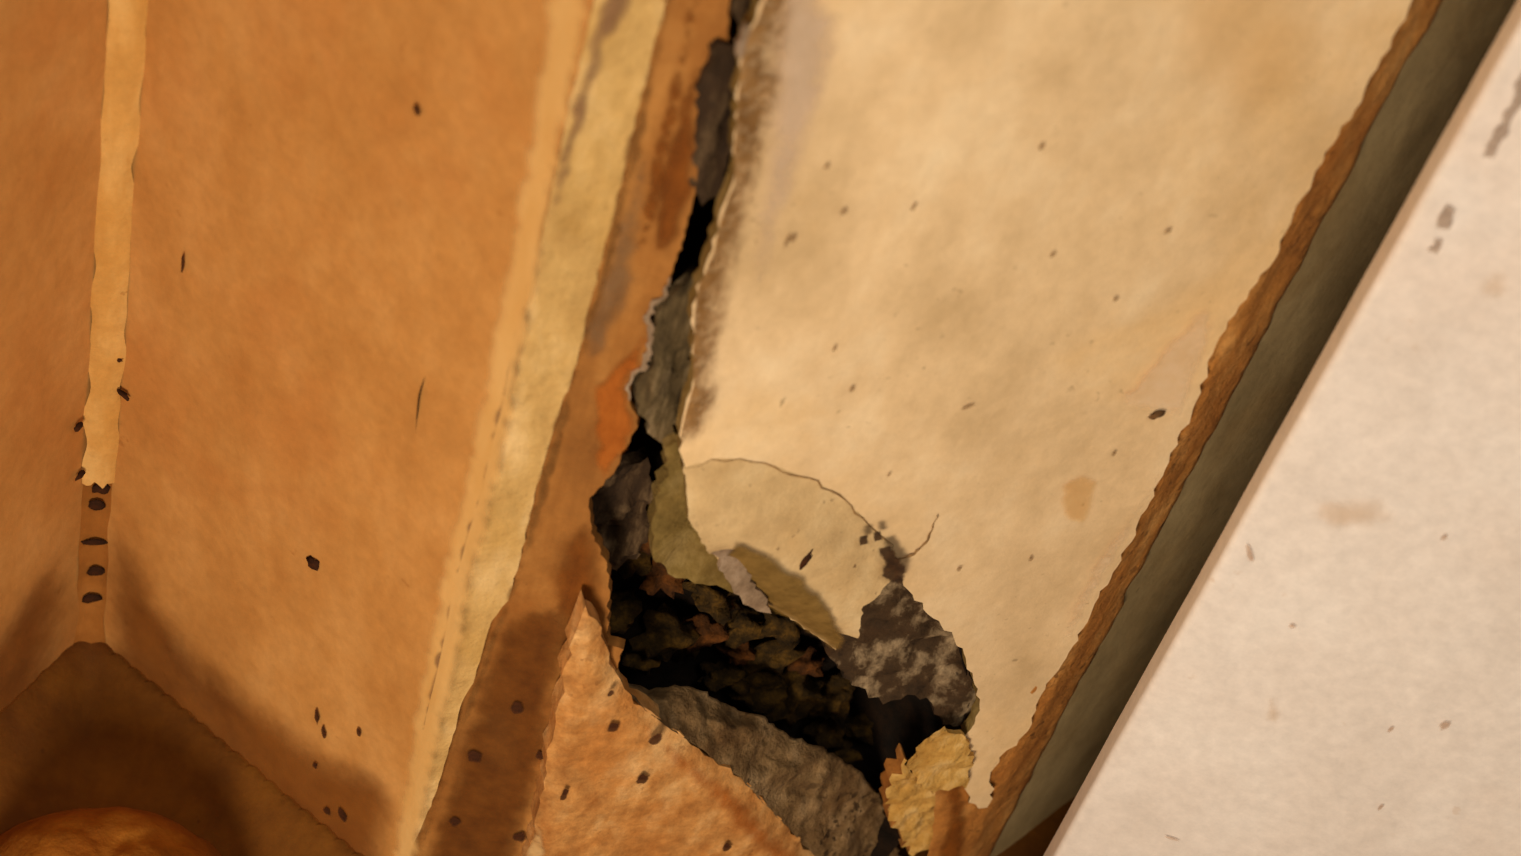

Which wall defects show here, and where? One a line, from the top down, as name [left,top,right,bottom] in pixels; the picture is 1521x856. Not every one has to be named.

crack [688,0,752,206]
leakage [681,0,820,437]
crack [625,262,938,559]
spalling [591,0,1443,856]